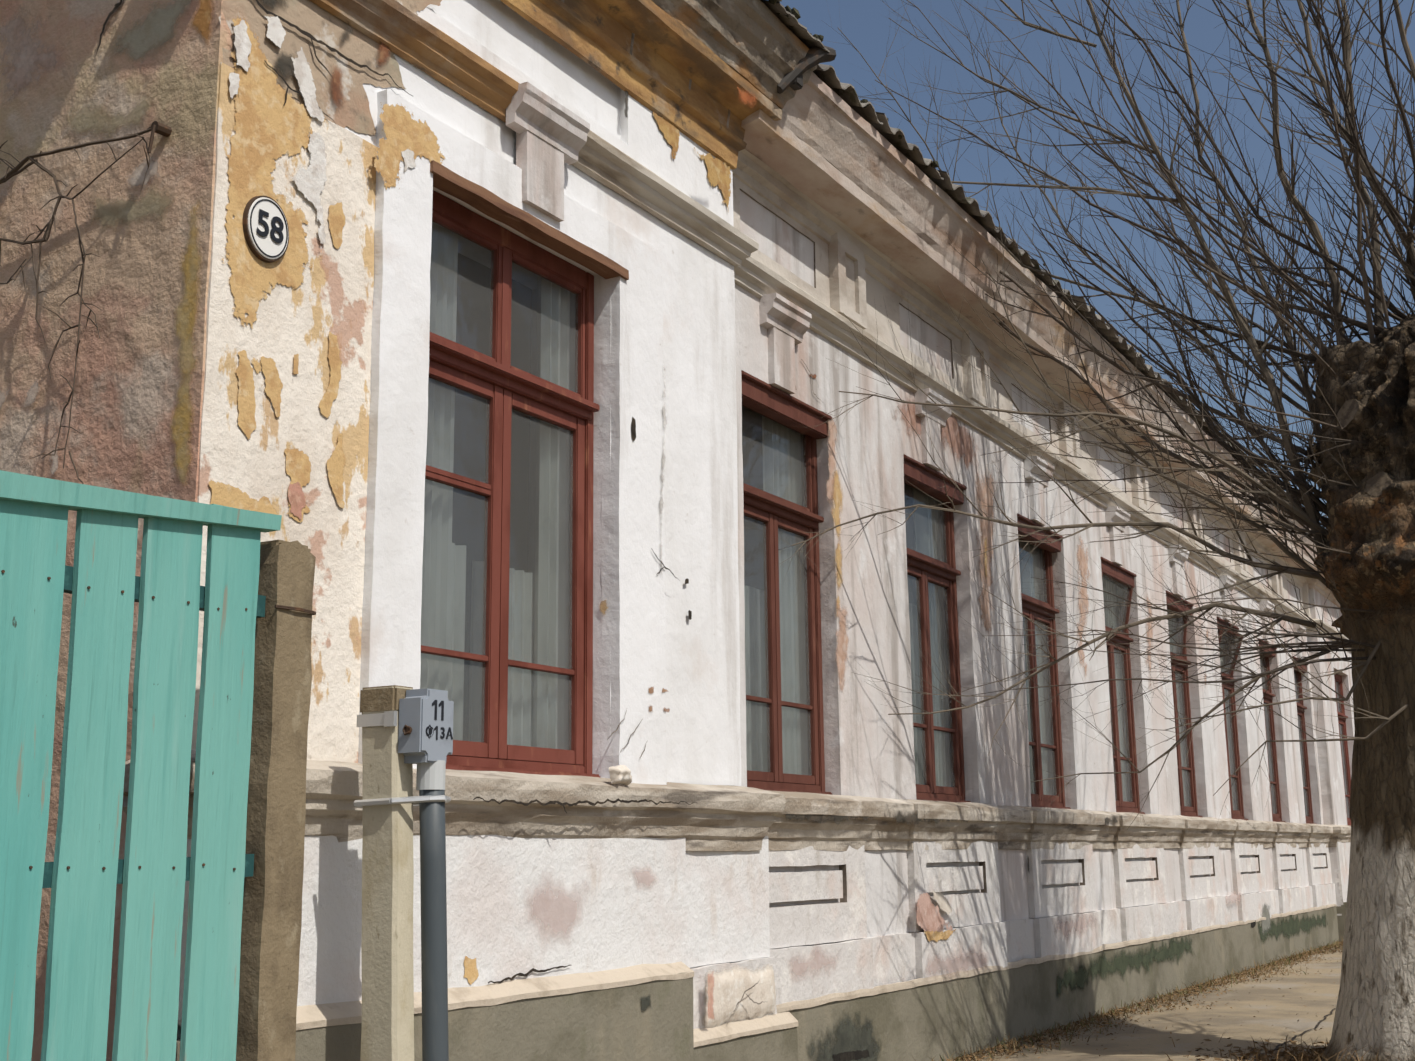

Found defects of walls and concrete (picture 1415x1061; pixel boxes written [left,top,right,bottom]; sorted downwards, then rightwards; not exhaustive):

crack [96,0,122,54]
crack [256,0,412,124]
spalling [222,11,325,329]
spalling [374,103,445,190]
spalling [328,202,345,249]
spalling [236,350,299,439]
spalling [319,331,342,418]
spalling [209,433,347,523]
spalling [916,890,956,942]
crack [488,965,572,984]